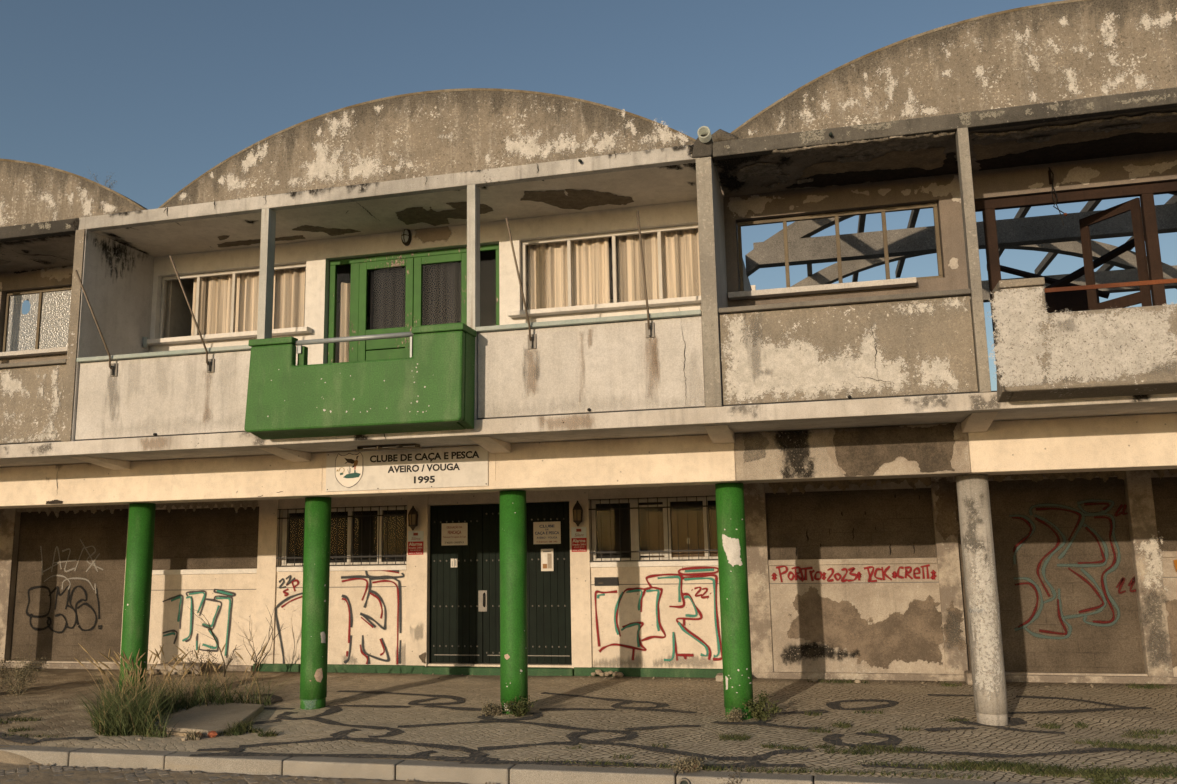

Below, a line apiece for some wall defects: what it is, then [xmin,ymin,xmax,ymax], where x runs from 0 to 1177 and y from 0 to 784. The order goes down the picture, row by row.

peeling [773,66,939,132]
flaking render [727,112,1177,218]
water stain [0,210,148,275]
flaking render [275,225,361,241]
flaking render [396,202,493,243]
flaking render [520,189,634,210]
peeling [720,313,969,404]
peeling [887,296,971,318]
peeling [988,287,1177,387]
water stain [774,430,814,479]
spalling [722,519,743,572]
flaking render [787,423,1003,700]